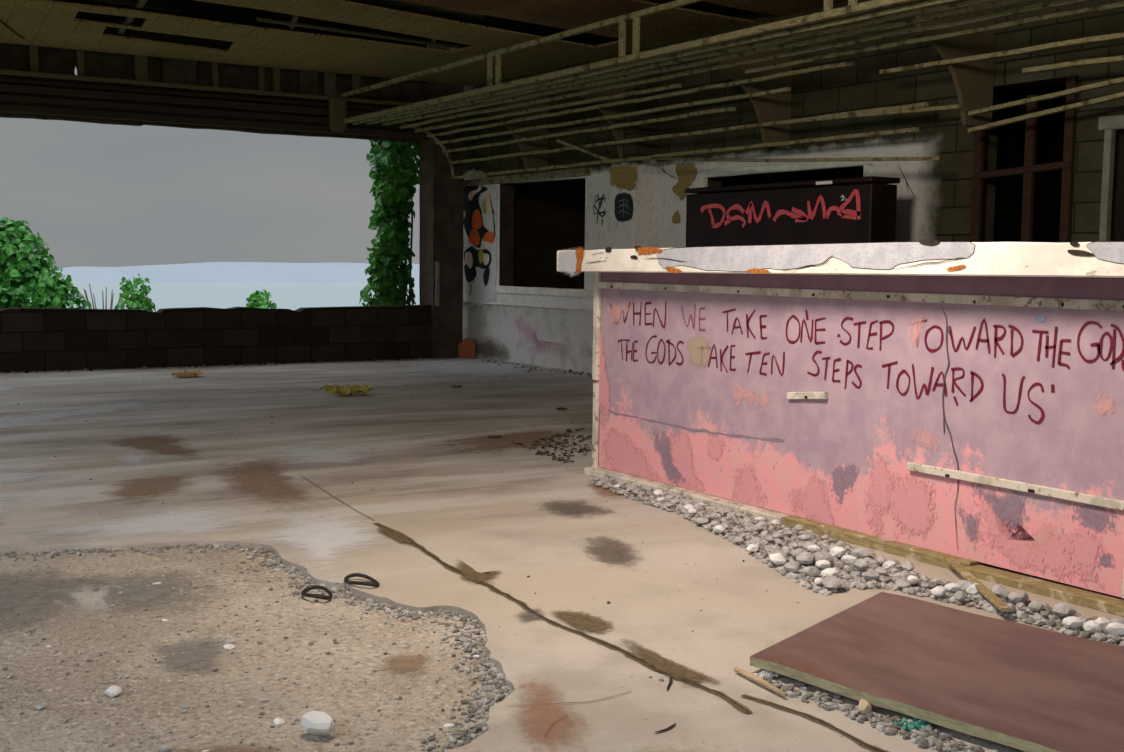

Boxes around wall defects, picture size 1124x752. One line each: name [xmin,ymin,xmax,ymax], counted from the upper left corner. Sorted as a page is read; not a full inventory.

peeling [672,163,697,224]
peeling [657,239,975,272]
peeling [1067,241,1124,264]
crack [942,308,959,549]
peeling [787,475,834,525]
peeling [973,496,1104,591]
crack [304,477,889,752]
spalling [0,543,514,752]
corrosion [523,685,574,743]